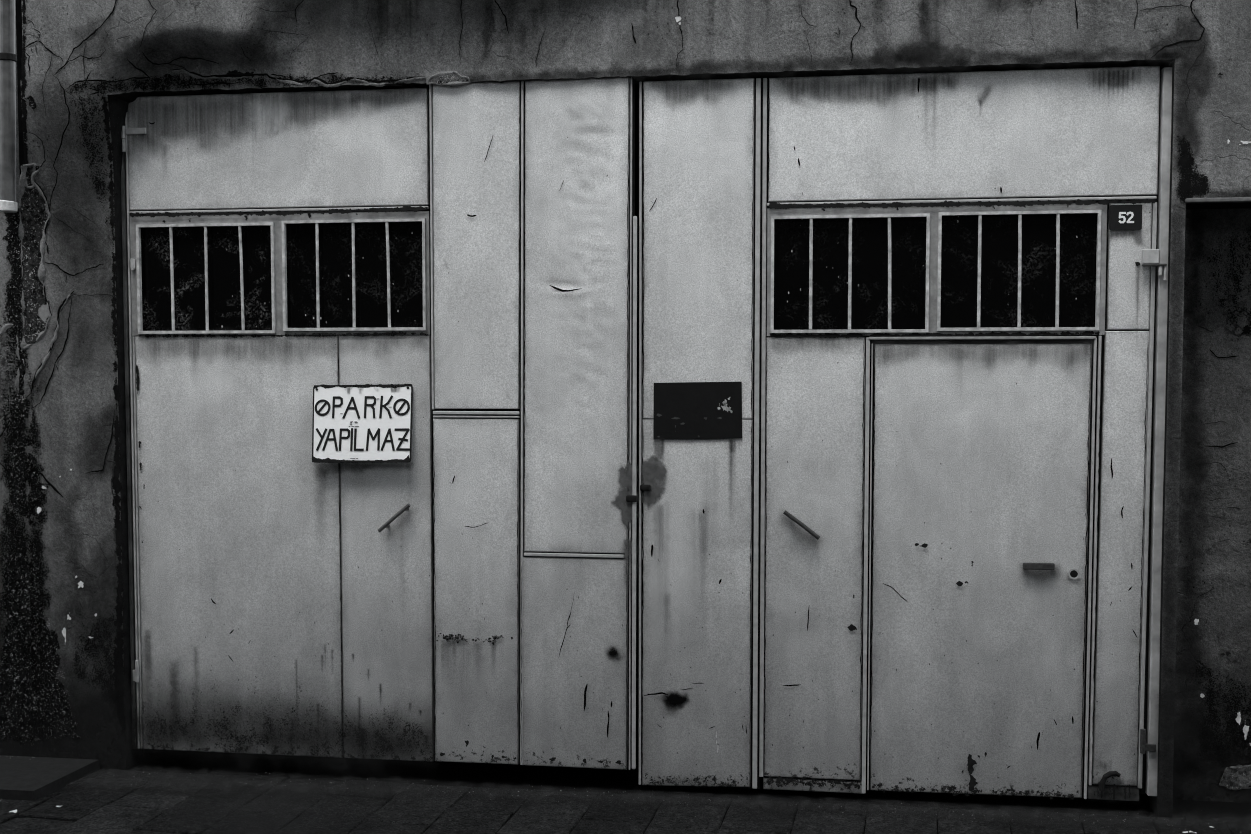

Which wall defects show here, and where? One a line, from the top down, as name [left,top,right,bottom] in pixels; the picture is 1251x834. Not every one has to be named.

crack [457,0,465,60]
crack [675,0,683,66]
crack [801,0,865,65]
crack [1134,0,1205,110]
crack [0,0,425,509]
leakage [0,283,52,657]
crack [1196,421,1240,542]
spalling [0,546,81,747]
spalling [1219,764,1251,790]
peeling [1236,712,1251,746]